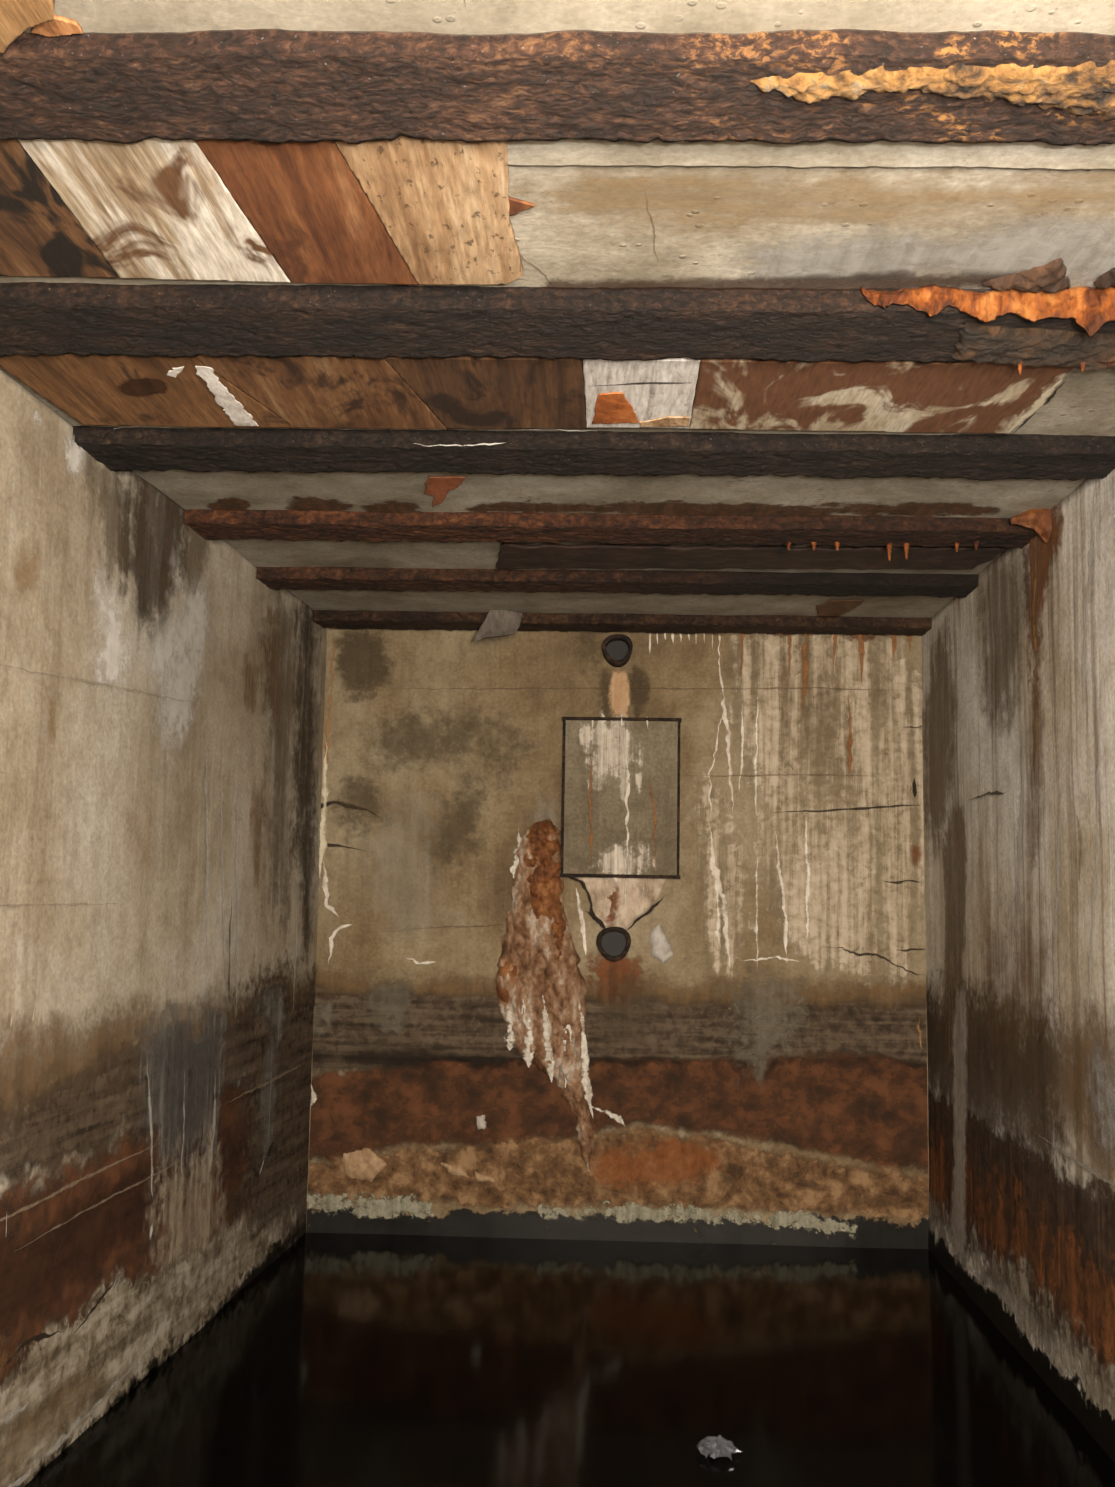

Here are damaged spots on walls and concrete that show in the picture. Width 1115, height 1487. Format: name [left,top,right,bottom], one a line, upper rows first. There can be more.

corrosion [208,497,250,511]
corrosion [286,476,466,513]
corrosion [466,500,1000,517]
corrosion [886,543,909,561]
damp [0,438,1115,1463]
corrosion [495,818,641,1172]